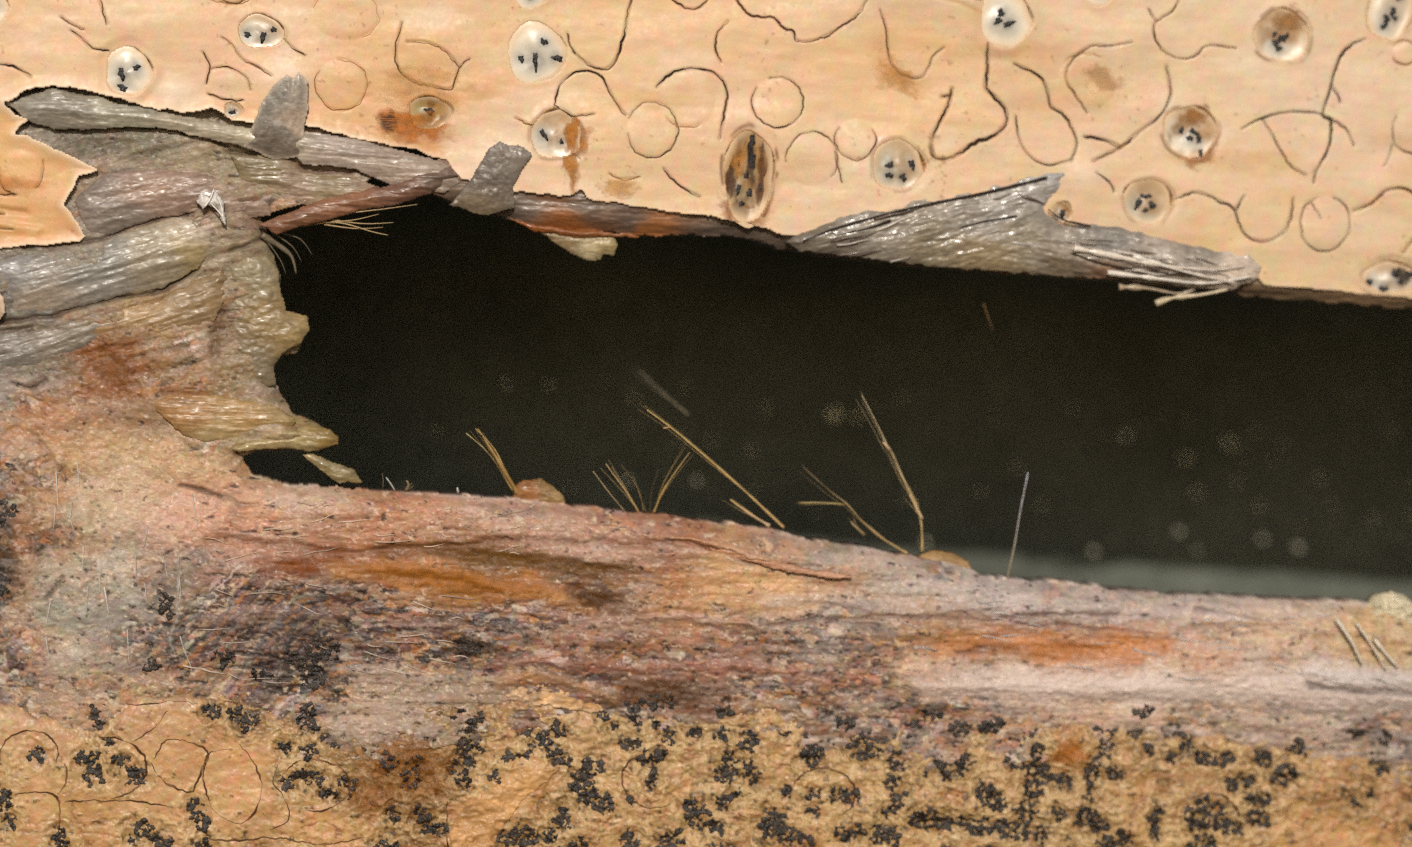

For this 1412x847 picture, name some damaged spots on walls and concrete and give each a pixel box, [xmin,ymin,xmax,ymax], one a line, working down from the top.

crack [60,0,109,51]
crack [203,39,271,102]
crack [285,1,469,111]
corrosion [380,111,445,142]
corrosion [563,118,587,189]
corrosion [725,143,767,222]
crack [516,0,1235,197]
crack [1174,39,1412,252]
peeling [0,88,460,387]
peeling [538,231,618,261]
peeling [155,393,362,484]
corrosion [271,558,318,575]